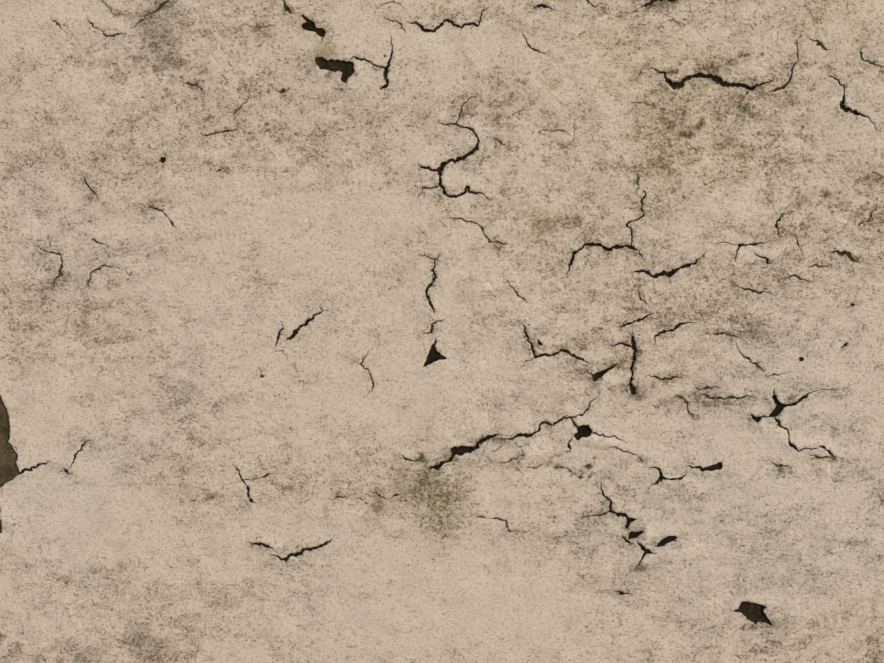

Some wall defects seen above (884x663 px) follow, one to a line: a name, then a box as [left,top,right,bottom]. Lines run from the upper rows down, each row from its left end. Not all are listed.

crack [351,0,489,90]
crack [637,38,830,104]
crack [829,75,881,132]
crack [417,95,509,245]
crack [271,307,326,357]
crack [402,173,858,489]
spalling [0,396,20,487]
crack [235,466,272,503]
crack [249,537,334,562]
crack [477,516,516,532]
crack [583,483,678,569]
spalling [734,601,773,626]